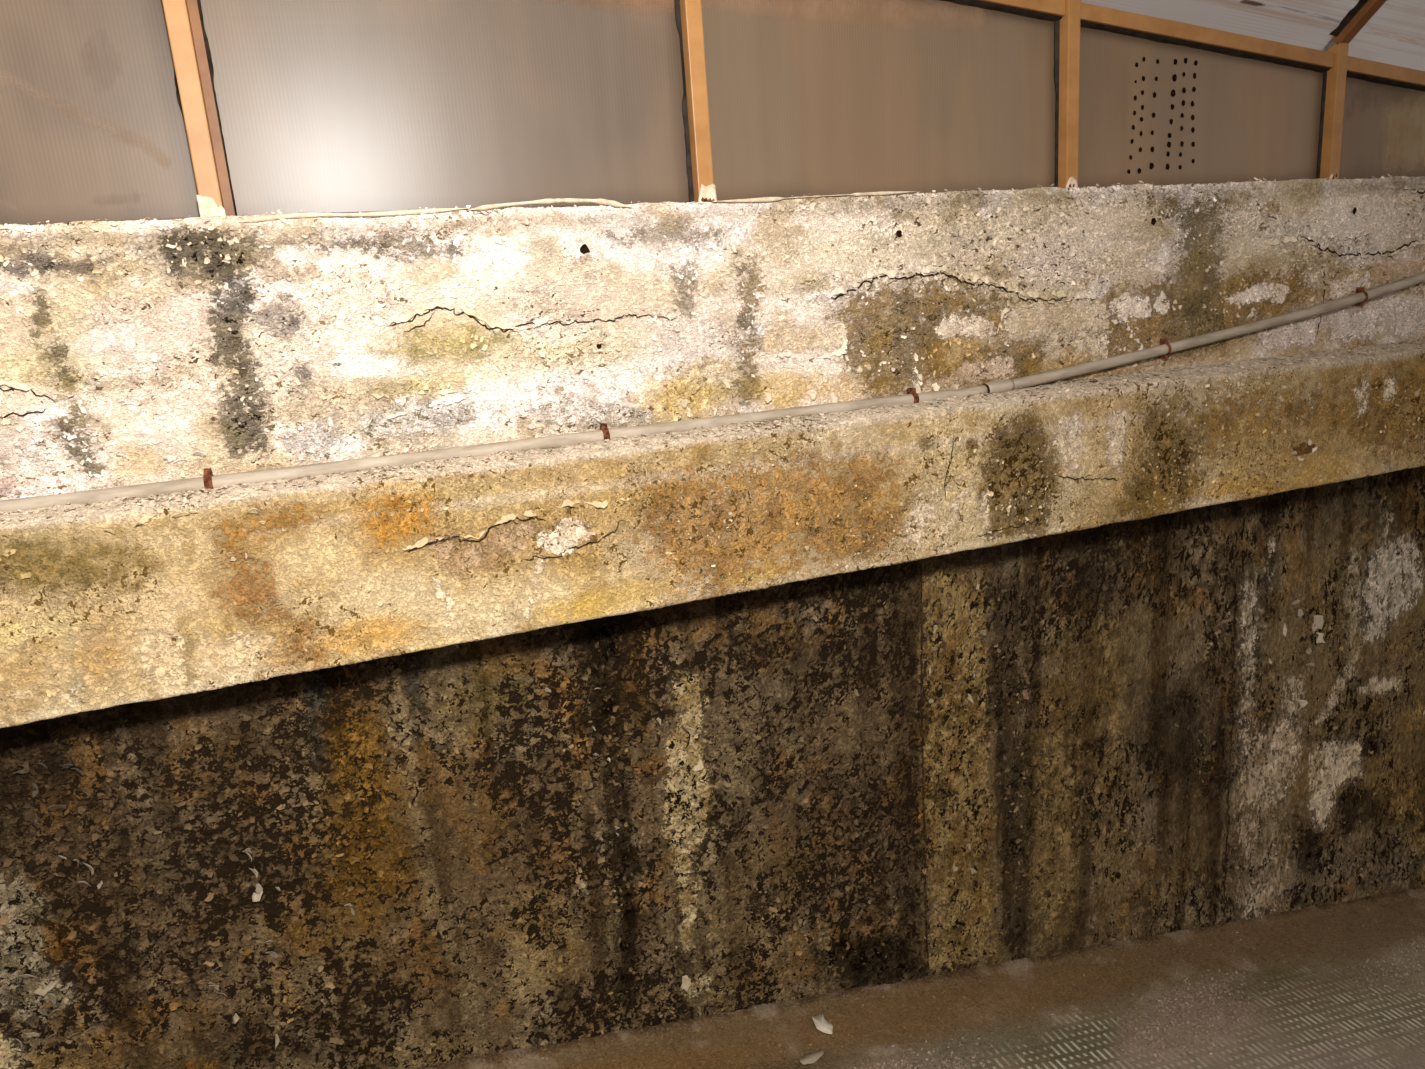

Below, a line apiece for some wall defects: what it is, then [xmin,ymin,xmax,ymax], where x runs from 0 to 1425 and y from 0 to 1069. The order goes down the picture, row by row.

water stain [0,247,126,278]
peeling [0,209,337,326]
water stain [136,224,468,459]
crack [389,307,675,335]
crack [826,271,1099,306]
peeling [0,380,149,489]
water stain [966,411,1066,544]
crack [404,516,545,553]
crack [522,520,621,576]
spalling [87,631,198,722]
water stain [1145,536,1306,856]
peeling [0,671,449,1069]